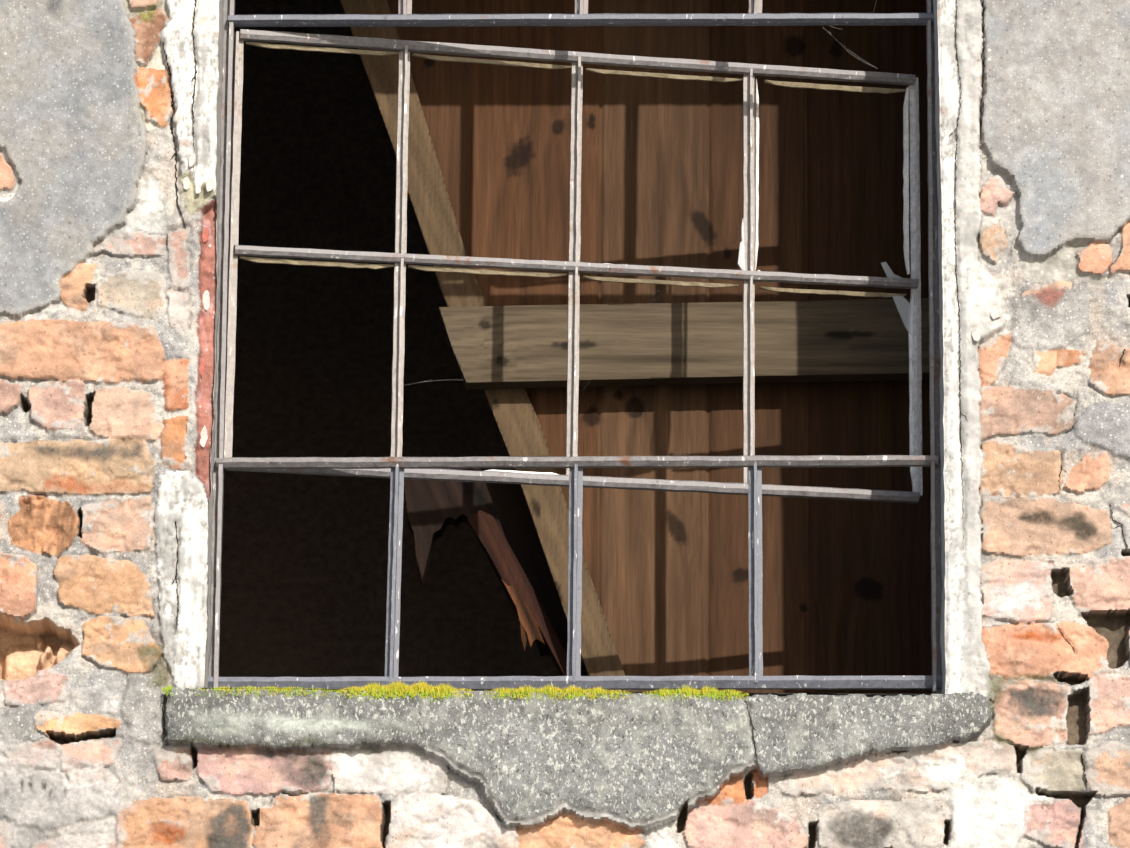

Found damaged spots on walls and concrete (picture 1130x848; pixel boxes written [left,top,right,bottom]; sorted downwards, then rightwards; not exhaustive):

crack [162,0,197,229]
flaking render [977,155,1130,308]
crack [949,1,985,549]
peeling [181,150,217,499]
peeling [1051,566,1074,598]
spalling [0,611,80,680]
peeling [1081,608,1130,669]
spalling [427,741,758,833]
crack [744,696,759,762]
peeling [1015,744,1029,773]
peeling [1036,787,1098,848]
peeling [1053,671,1092,745]